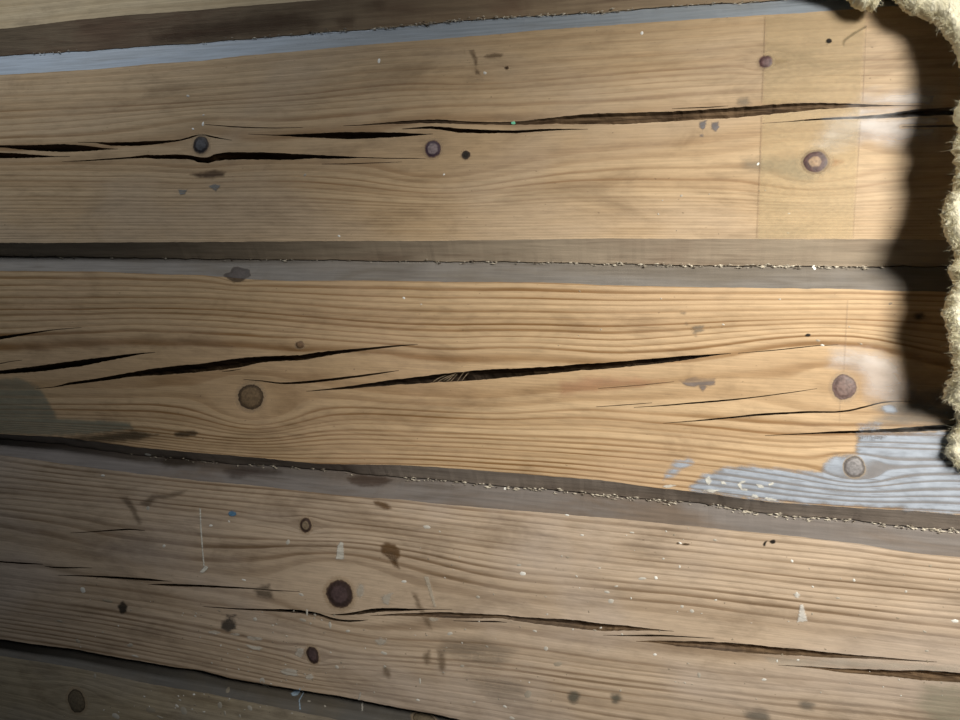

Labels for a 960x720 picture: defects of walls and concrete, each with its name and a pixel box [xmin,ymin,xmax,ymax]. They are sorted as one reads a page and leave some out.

crack [0,103,957,164]
crack [0,327,956,436]
crack [0,561,960,683]